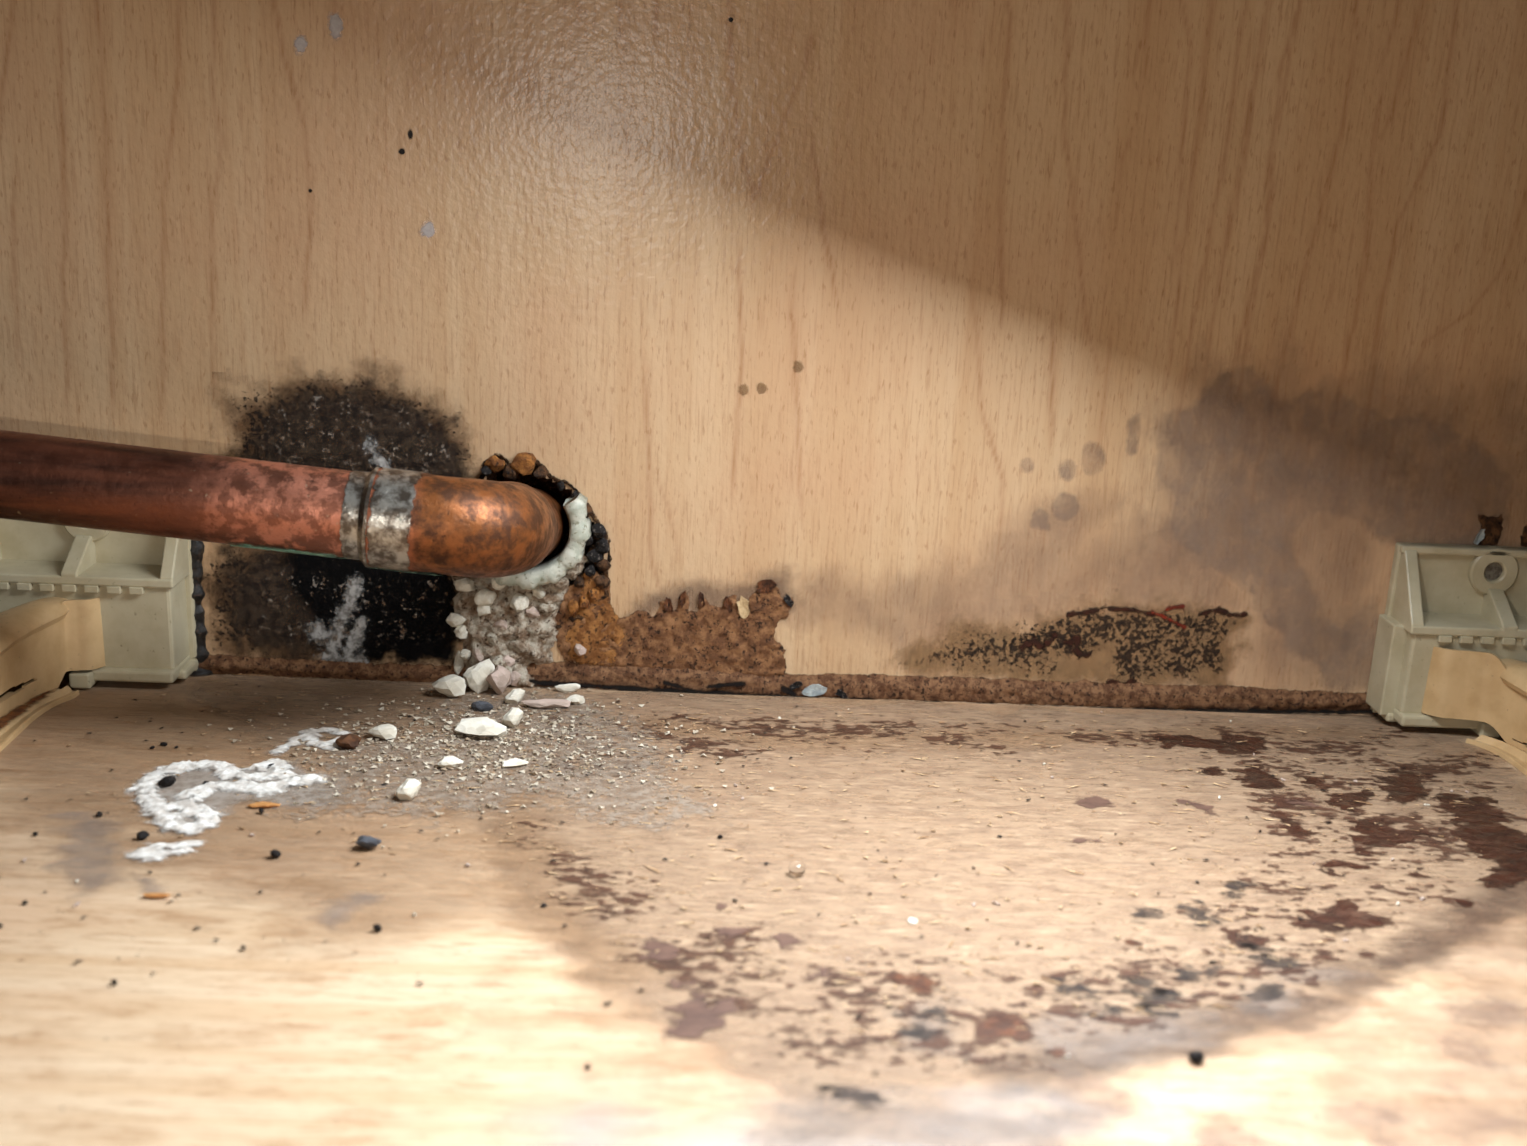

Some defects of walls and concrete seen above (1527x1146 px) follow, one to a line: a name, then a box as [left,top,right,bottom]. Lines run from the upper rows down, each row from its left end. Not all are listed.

leakage [226,379,468,478]
peeling [477,452,794,677]
peeling [1474,514,1503,546]
leakage [190,540,1527,1137]